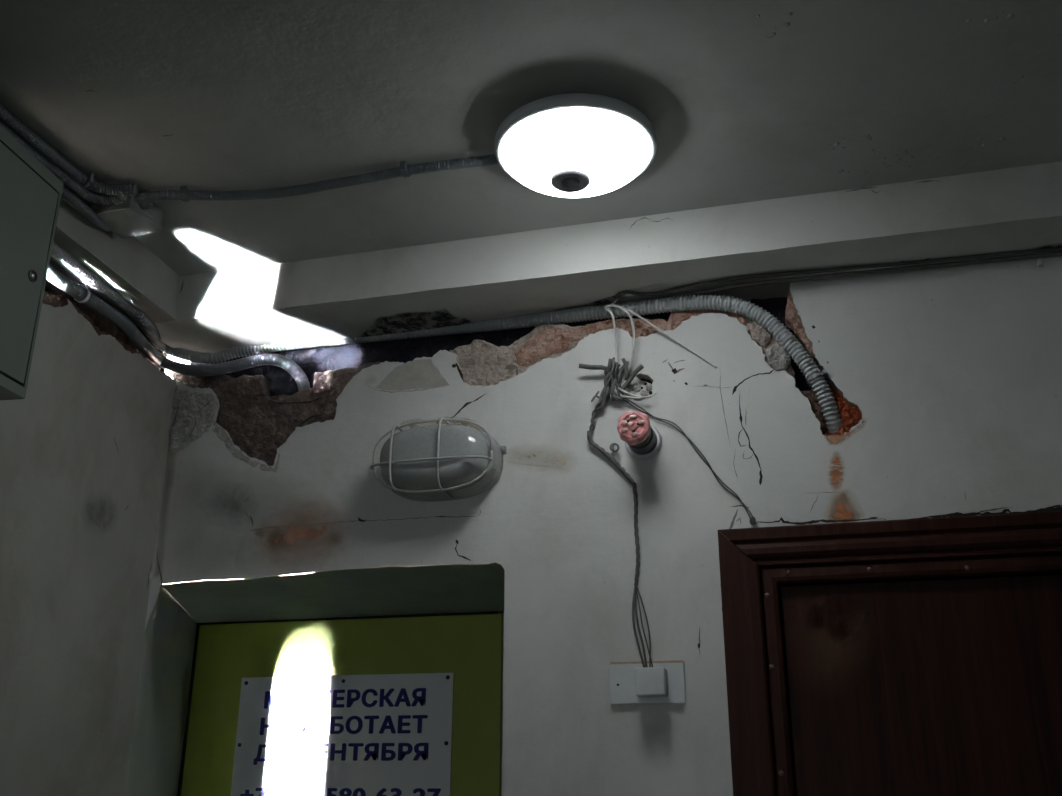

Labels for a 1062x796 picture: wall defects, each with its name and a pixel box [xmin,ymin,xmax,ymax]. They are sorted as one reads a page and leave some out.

spalling [449,309,795,386]
spalling [785,288,828,363]
spalling [171,359,449,473]
spalling [627,378,653,401]
crack [694,367,774,485]
rust [830,457,854,521]